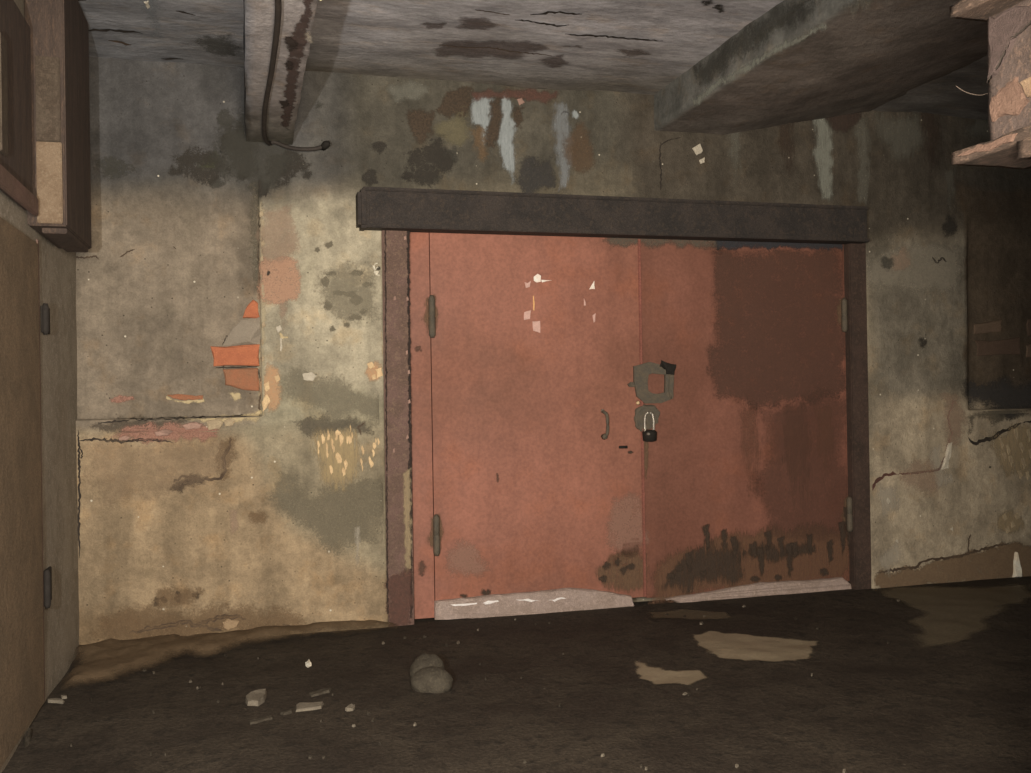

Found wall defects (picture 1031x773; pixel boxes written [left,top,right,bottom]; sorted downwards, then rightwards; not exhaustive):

leakage [168,87,312,197]
leakage [389,82,595,193]
flaking render [210,182,281,415]
crack [170,437,236,492]
crack [872,400,958,491]
corrosion [596,507,850,604]